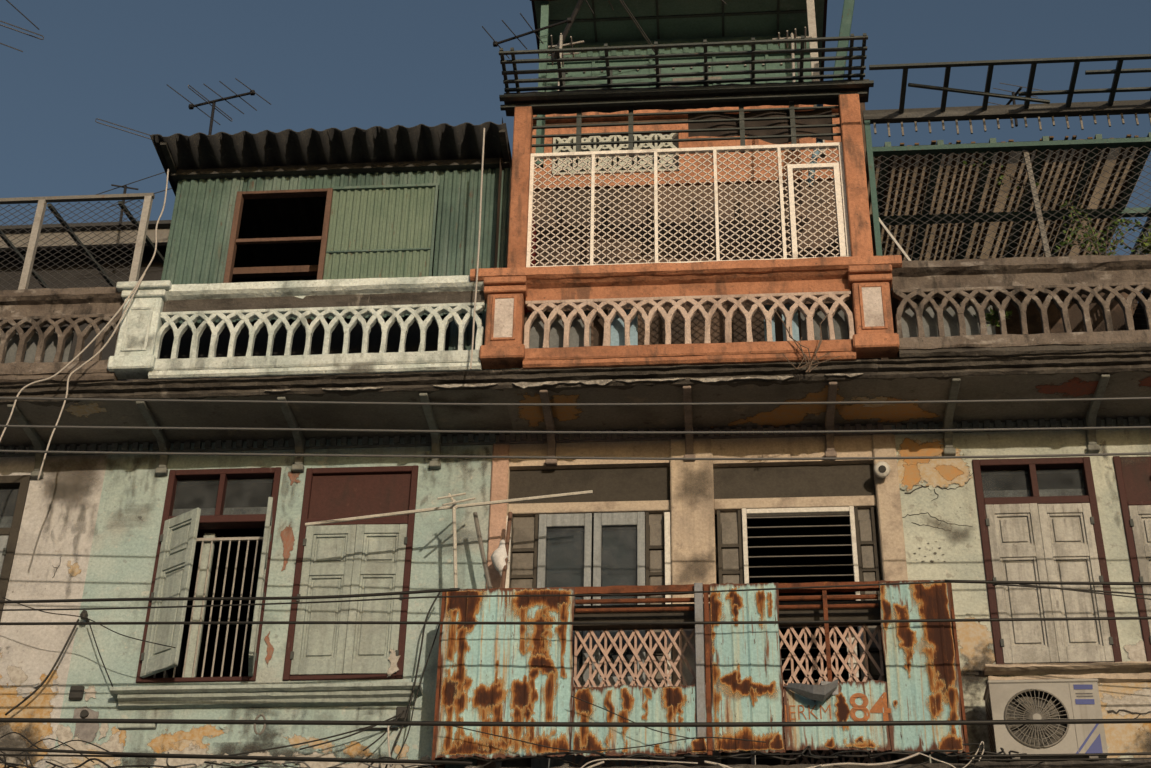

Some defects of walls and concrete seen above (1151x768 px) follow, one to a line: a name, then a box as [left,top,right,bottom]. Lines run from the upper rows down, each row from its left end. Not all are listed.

peeling [512,376,795,428]
peeling [710,373,940,429]
damp [47,461,96,502]
peeling [897,438,973,491]
damp [67,561,81,576]
peeling [280,525,295,571]
corrosion [441,589,687,755]
corrosion [691,587,784,753]
corrosion [880,583,963,750]
peeling [0,646,126,768]
peeling [147,724,432,768]
peeling [1098,681,1151,761]